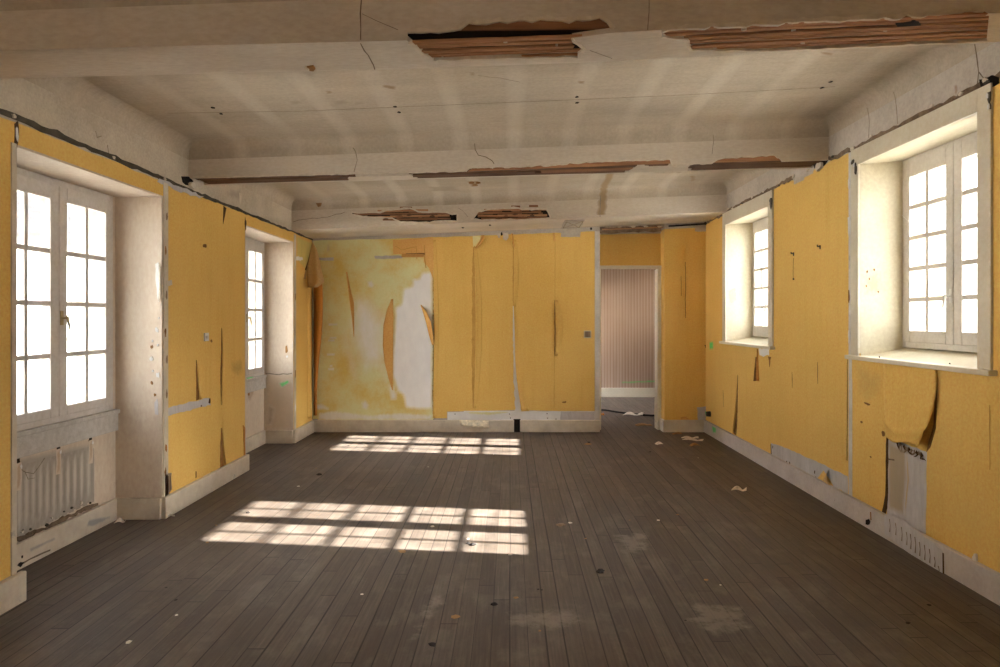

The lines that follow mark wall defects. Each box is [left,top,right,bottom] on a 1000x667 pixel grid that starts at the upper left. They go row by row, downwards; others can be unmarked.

crack [360,0,398,70]
spalling [407,15,615,62]
spalling [661,7,989,53]
spalling [0,71,1000,240]
flaking render [771,443,848,494]
flaking render [882,437,943,573]